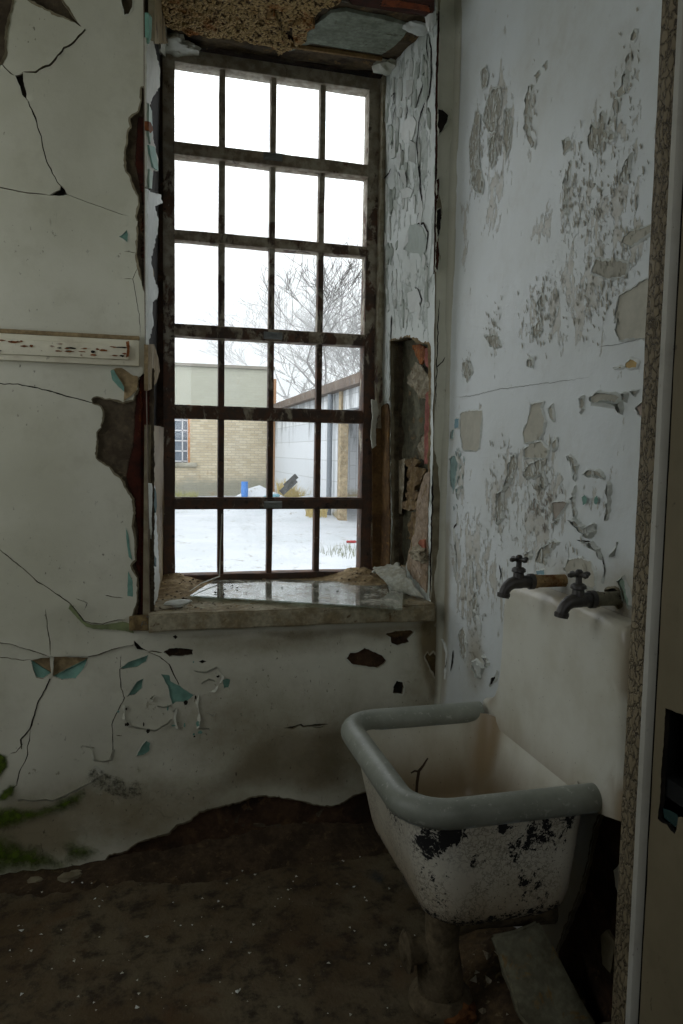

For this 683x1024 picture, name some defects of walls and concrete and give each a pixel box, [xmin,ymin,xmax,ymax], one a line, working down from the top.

crack [28,102,58,183]
peeling [468,60,548,200]
peeling [517,28,651,370]
spalling [56,0,436,616]
peeling [483,296,502,356]
peeling [578,389,642,417]
peeling [449,400,632,687]
crack [17,679,50,783]
peeling [31,656,89,679]
crack [7,555,134,750]
peeling [117,635,230,757]
spalling [344,628,415,670]